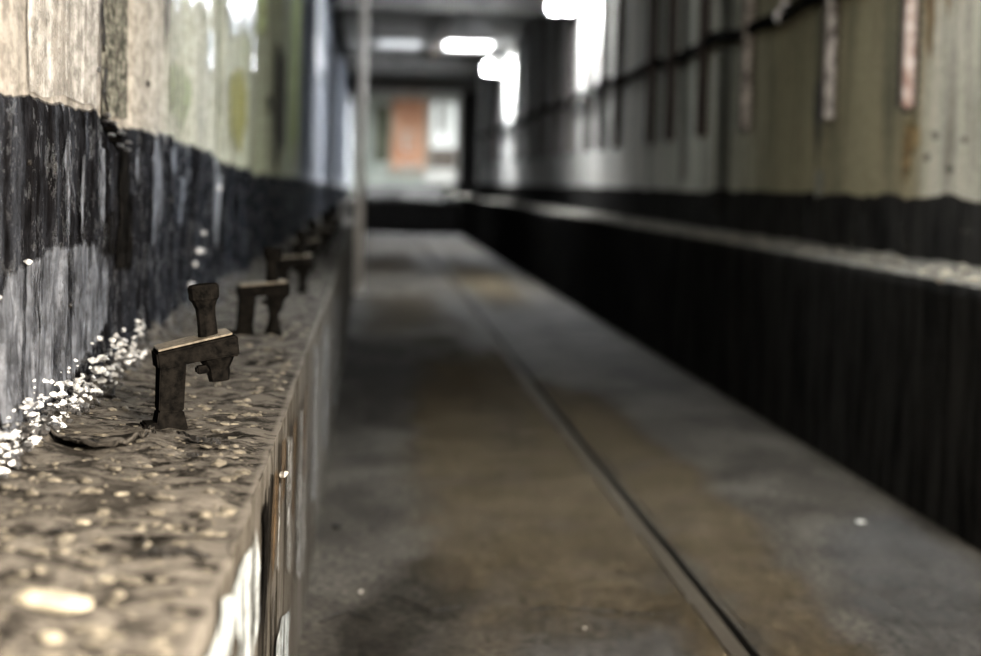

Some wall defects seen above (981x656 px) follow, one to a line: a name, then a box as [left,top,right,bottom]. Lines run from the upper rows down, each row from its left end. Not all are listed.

leakage [64,137,85,248]
leakage [135,138,185,247]
leakage [0,319,147,474]